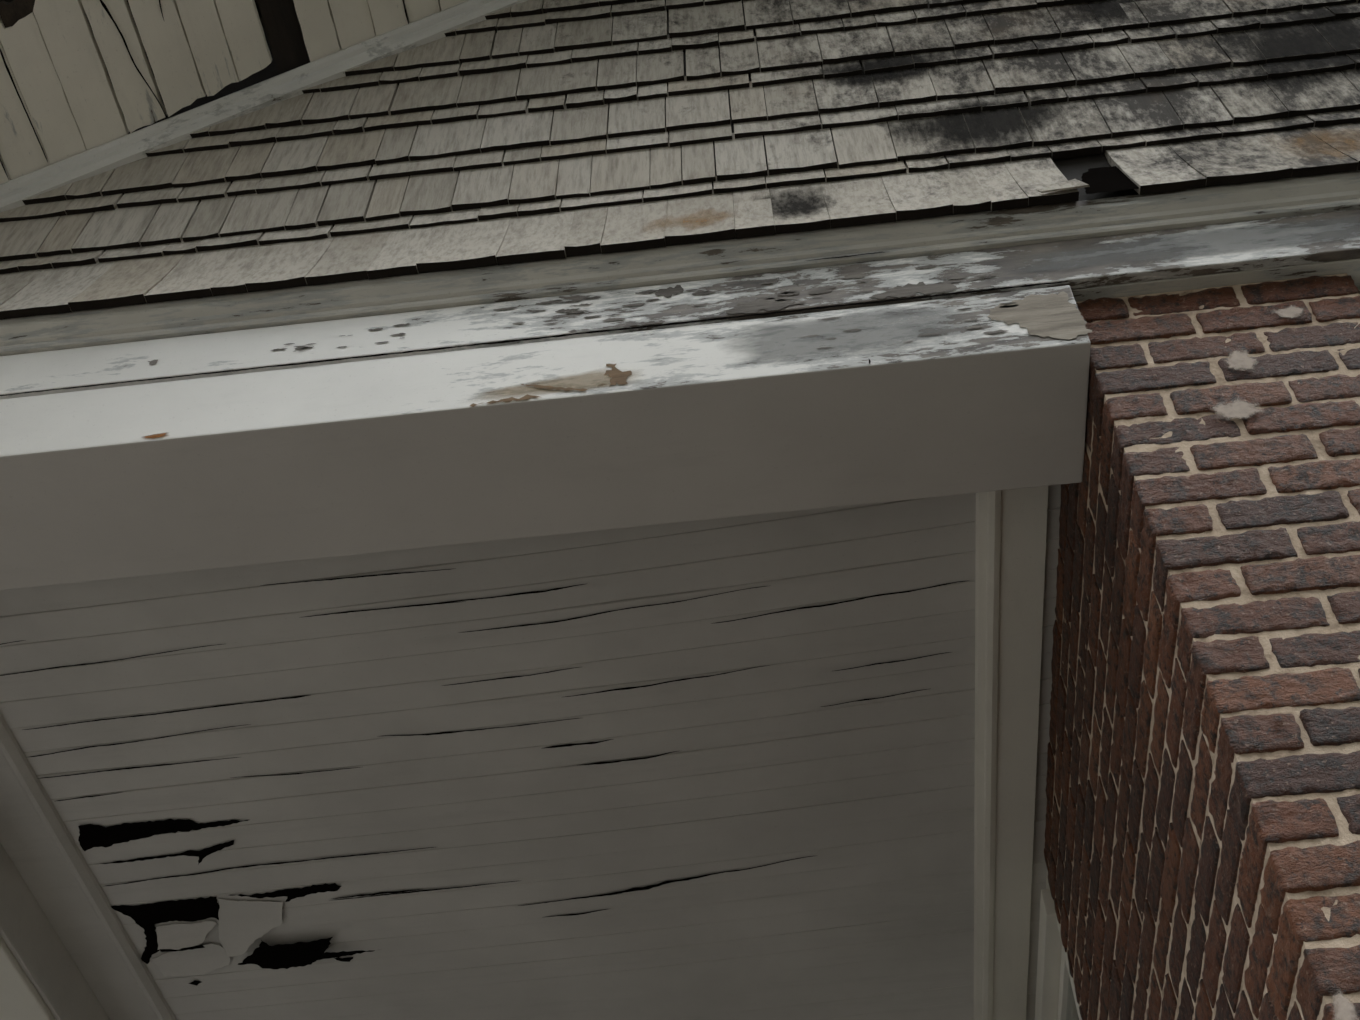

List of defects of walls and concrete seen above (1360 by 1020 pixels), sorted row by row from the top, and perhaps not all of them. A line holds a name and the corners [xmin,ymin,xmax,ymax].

crack [100,0,167,119]
peeling [493,285,724,325]
peeling [726,265,994,314]
peeling [956,291,1092,340]
peeling [604,364,632,387]
crack [260,568,970,633]
crack [384,665,770,765]
crack [24,695,360,801]
peeling [78,819,248,851]
crack [100,840,434,886]
crack [333,856,812,917]
peeling [111,883,375,986]